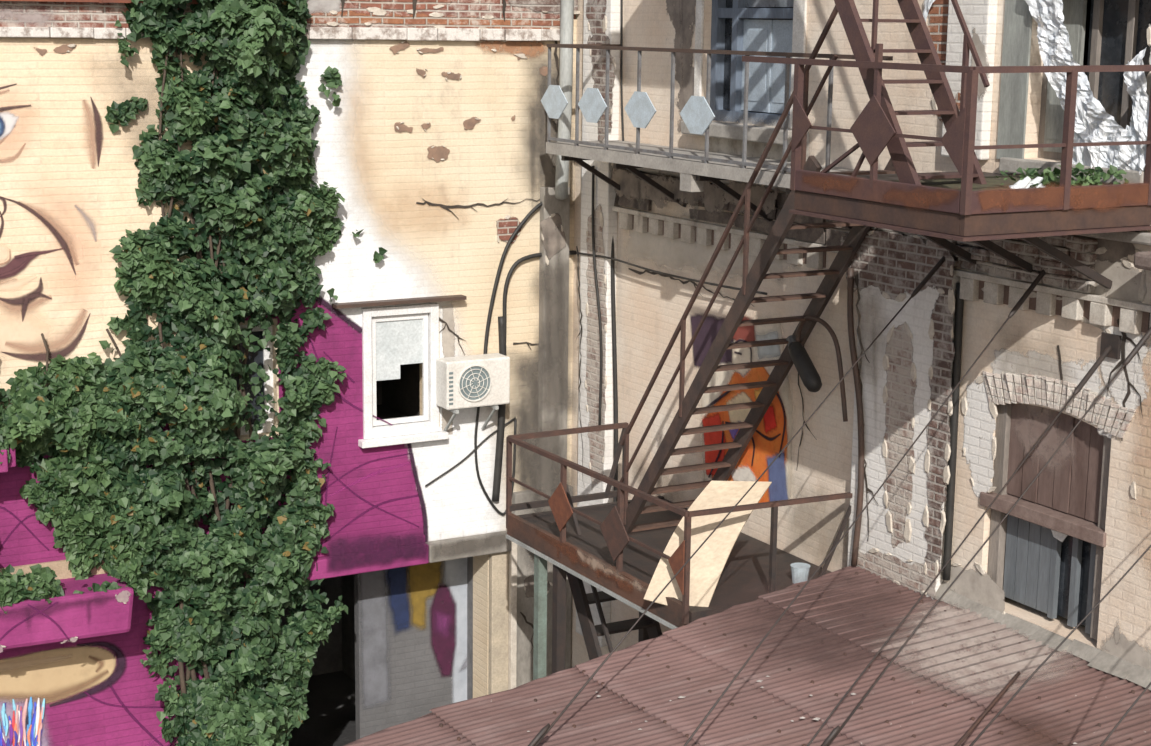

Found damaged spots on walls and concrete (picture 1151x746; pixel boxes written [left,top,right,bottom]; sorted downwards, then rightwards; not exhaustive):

flaking render [923,0,949,65]
flaking render [307,0,616,141]
peeling [666,0,696,132]
flaking render [427,146,450,162]
crack [416,199,540,217]
rust [979,184,1149,210]
flaking render [846,230,1151,614]